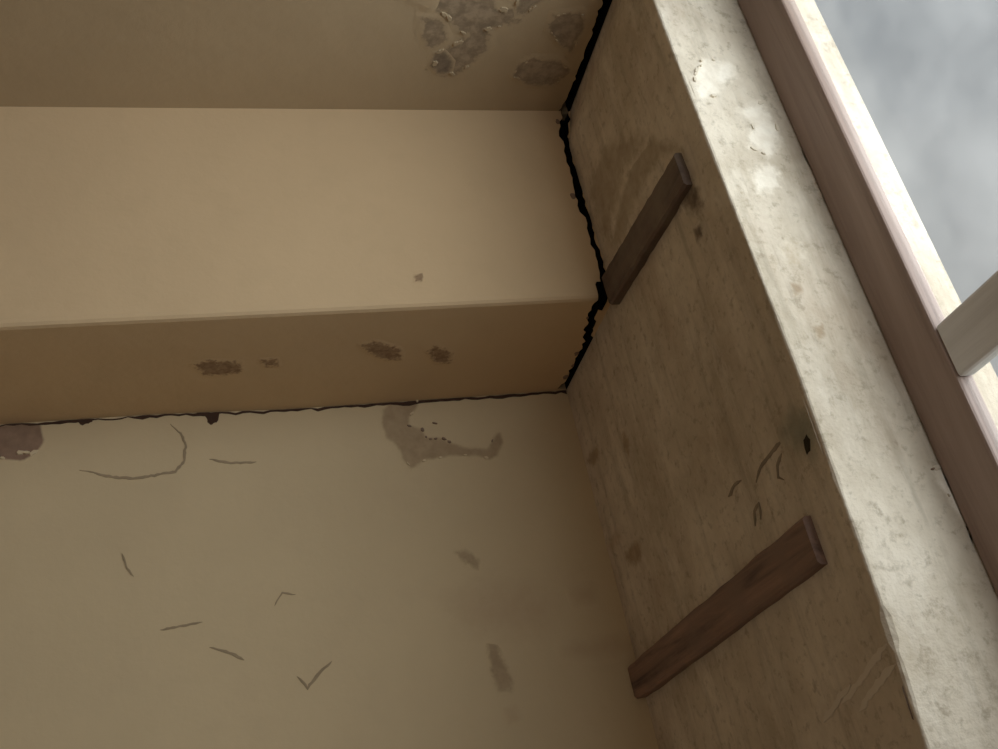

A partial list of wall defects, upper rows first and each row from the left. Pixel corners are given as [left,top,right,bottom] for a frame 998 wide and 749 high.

peeling [413,0,550,81]
crack [0,0,612,480]
flaking render [0,422,48,466]
flaking render [377,400,508,472]